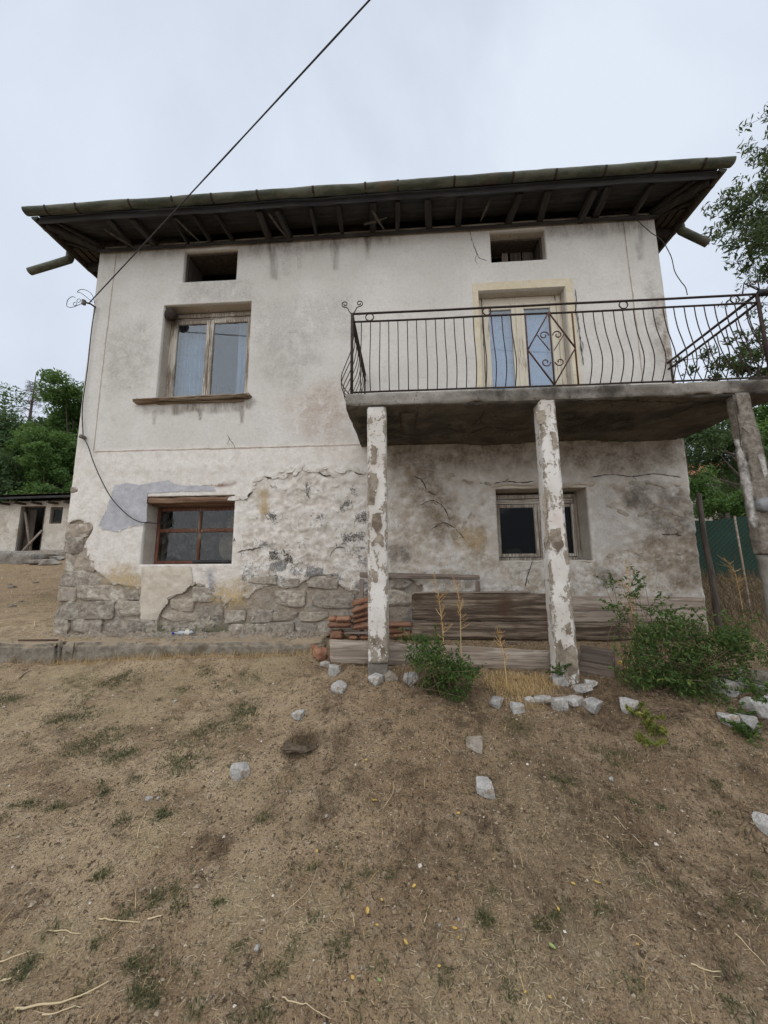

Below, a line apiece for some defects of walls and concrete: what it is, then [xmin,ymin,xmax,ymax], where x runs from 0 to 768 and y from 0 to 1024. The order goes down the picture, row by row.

peeling [536,410,558,450]
peeling [227,416,400,551]
crack [414,476,465,540]
peeling [542,495,564,552]
crack [592,471,681,479]
flaking render [53,480,423,661]
peeling [554,622,578,676]